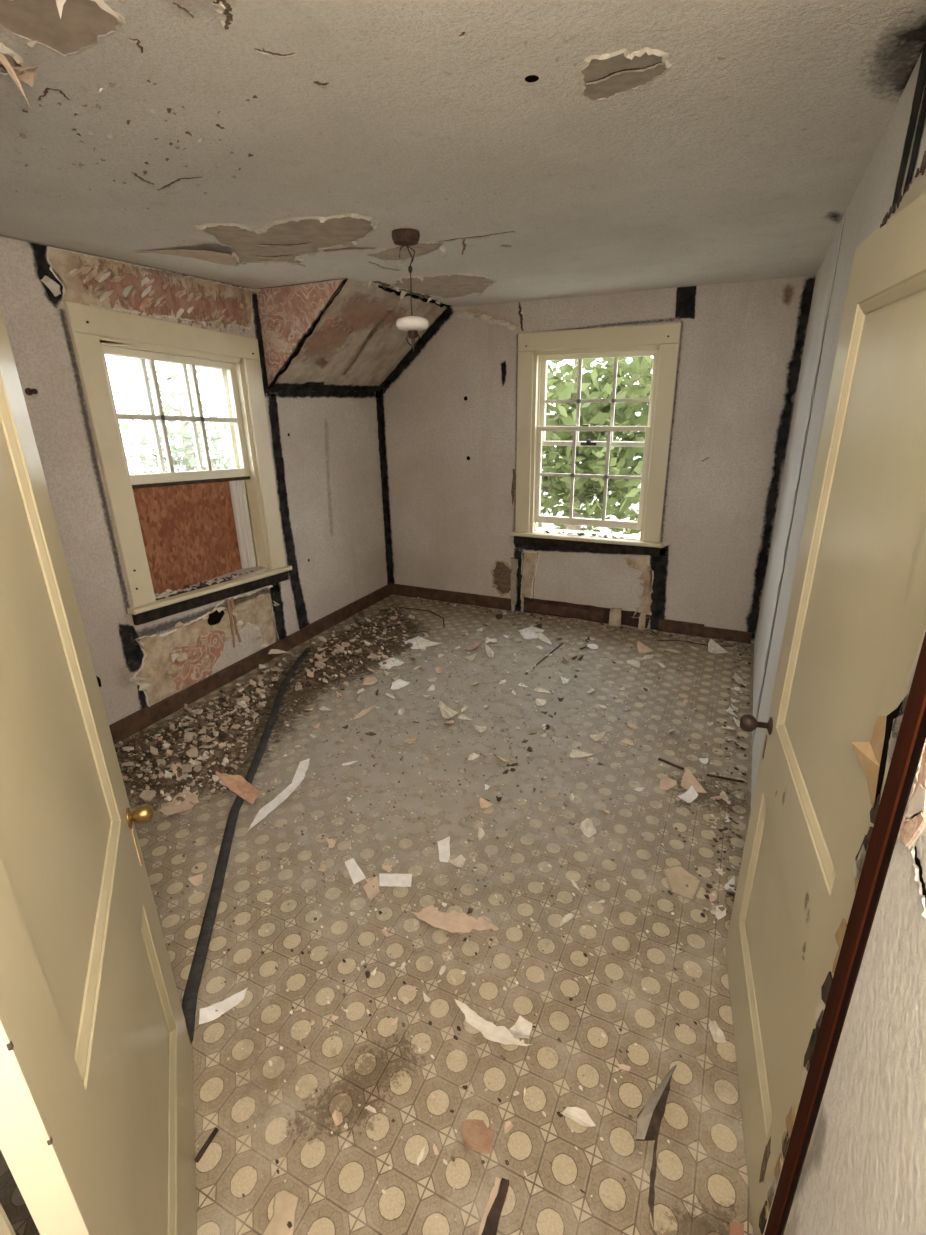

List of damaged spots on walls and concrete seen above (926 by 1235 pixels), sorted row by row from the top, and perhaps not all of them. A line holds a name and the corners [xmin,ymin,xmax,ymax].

peeling [213,0,233,30]
peeling [0,0,206,195]
peeling [135,213,497,303]